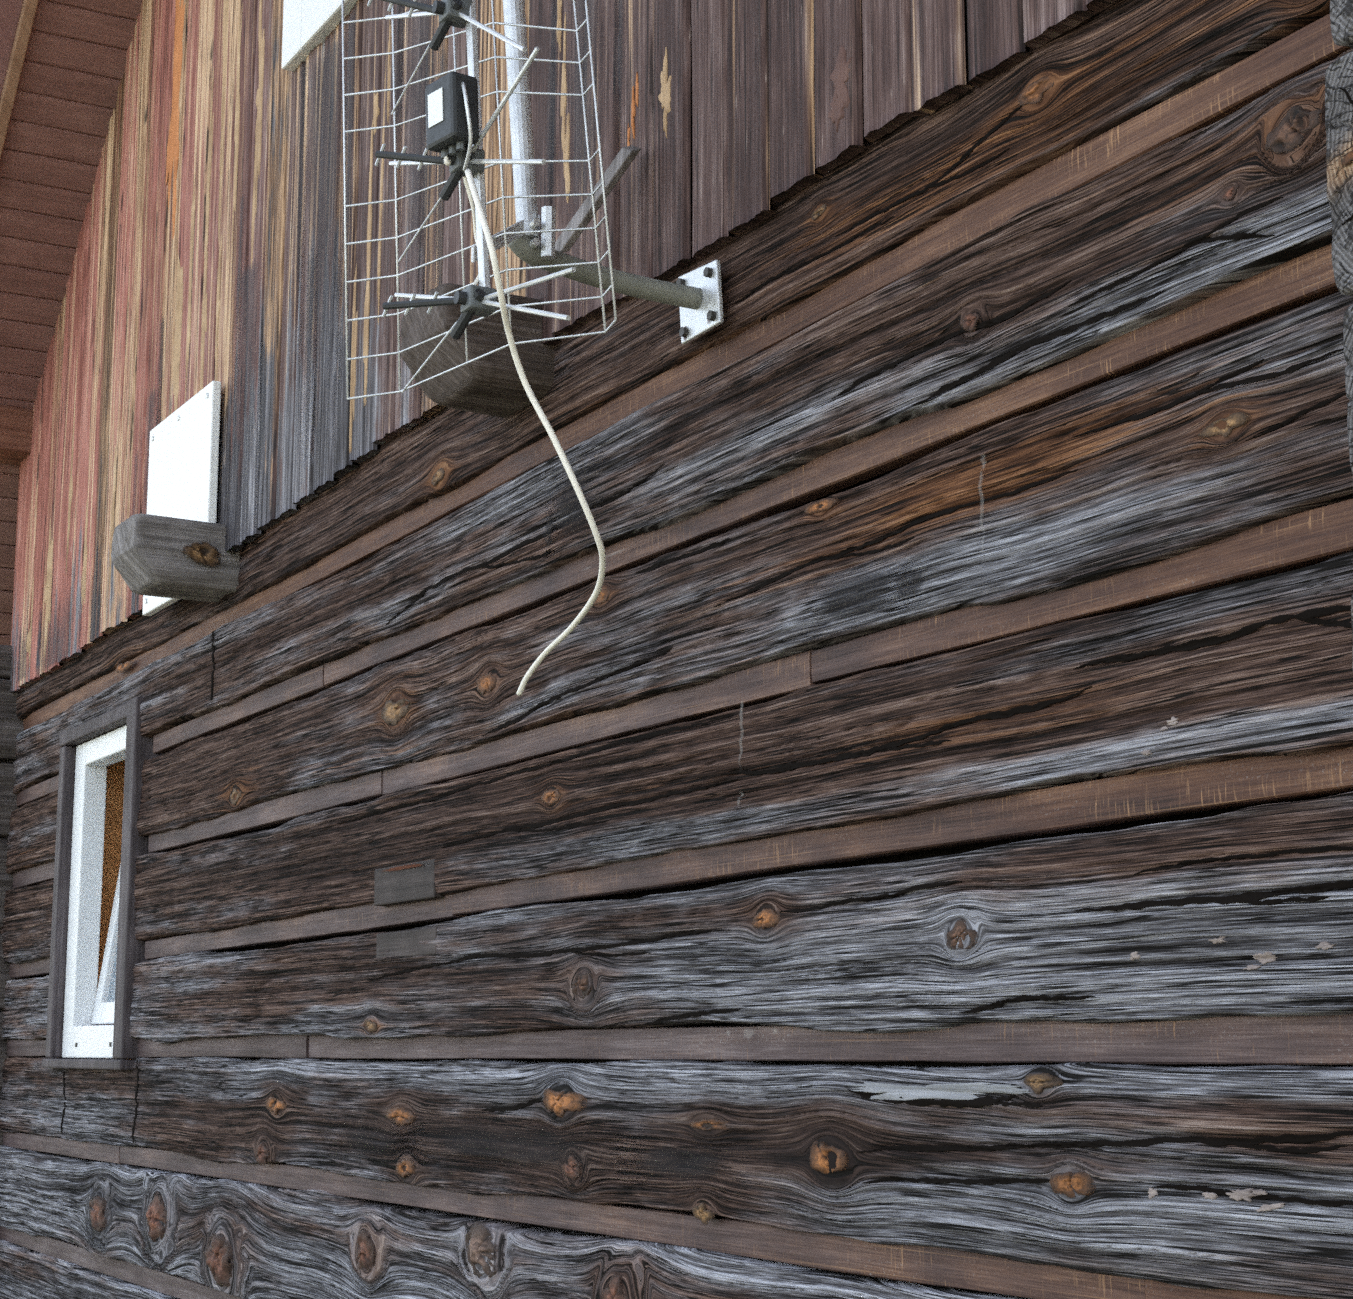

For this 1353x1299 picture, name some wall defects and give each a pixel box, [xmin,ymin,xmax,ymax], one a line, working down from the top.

crack [1340,88,1353,105]
crack [847,1089,1043,1108]
crack [859,1131,1353,1185]